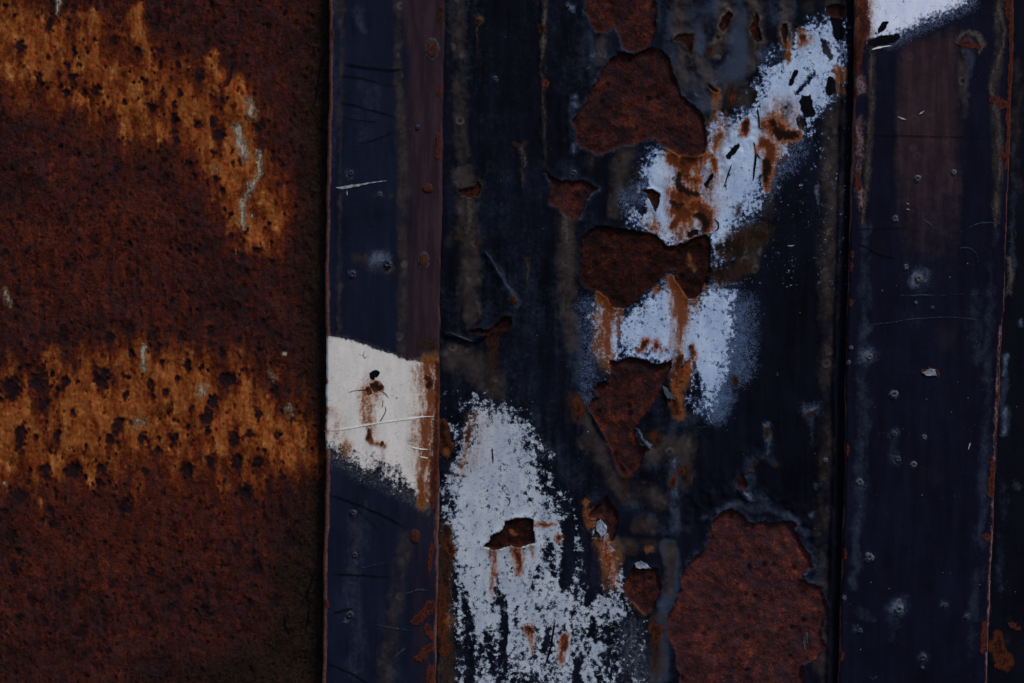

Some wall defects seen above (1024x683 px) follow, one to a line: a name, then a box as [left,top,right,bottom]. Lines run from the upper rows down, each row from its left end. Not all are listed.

corrosion [0,0,286,253]
peeling [571,0,720,162]
corrosion [653,123,771,287]
corrosion [738,99,802,191]
corrosion [0,333,328,513]
corrosion [362,380,386,448]
corrosion [412,337,471,509]
peeling [546,174,712,624]
corrosion [637,337,697,420]
peeling [485,518,535,589]
peeling [666,508,828,683]